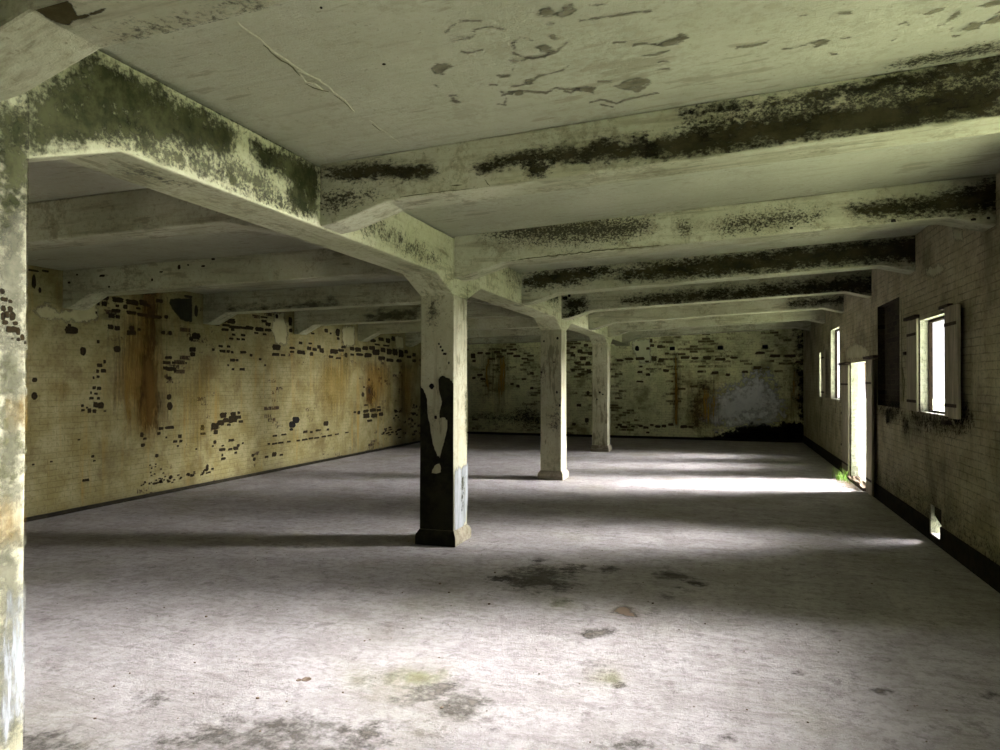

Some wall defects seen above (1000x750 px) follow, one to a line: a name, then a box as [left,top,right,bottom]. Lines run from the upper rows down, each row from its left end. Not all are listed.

crack [237,21,400,143]
peeling [489,3,659,108]
damp [473,41,1000,179]
damp [846,177,996,222]
damp [503,235,915,318]
corrosion [125,293,162,434]
flaking render [140,411,244,486]
damp [0,51,441,750]
flaking render [251,417,349,461]
flaking render [212,314,416,371]
spalling [354,376,453,531]
damp [415,683,492,720]